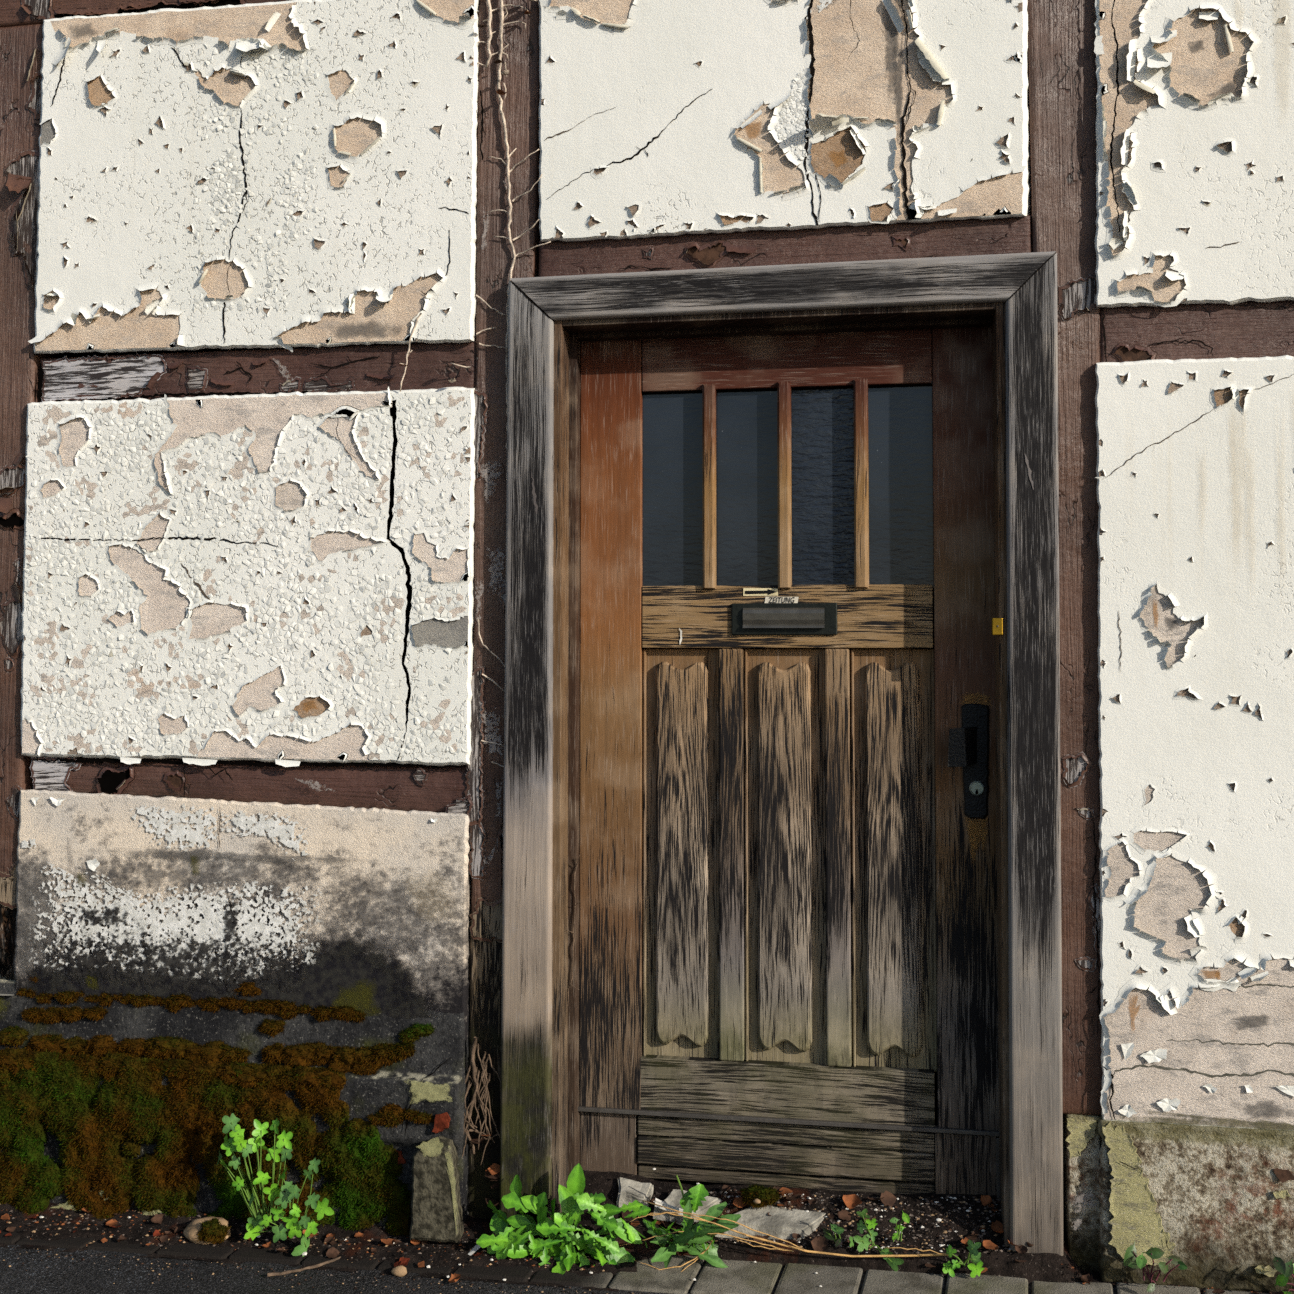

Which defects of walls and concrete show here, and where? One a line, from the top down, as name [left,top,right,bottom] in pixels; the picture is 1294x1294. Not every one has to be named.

crack [37,110,380,402]
crack [545,89,712,199]
crack [803,0,821,225]
peeling [730,0,1026,251]
crack [901,0,916,220]
peeling [1058,0,1263,321]
peeling [0,0,503,880]
crack [32,400,466,847]
peeling [1136,580,1209,670]
leakage [19,849,446,1019]
leakage [231,814,269,830]
peeling [1075,825,1294,1130]